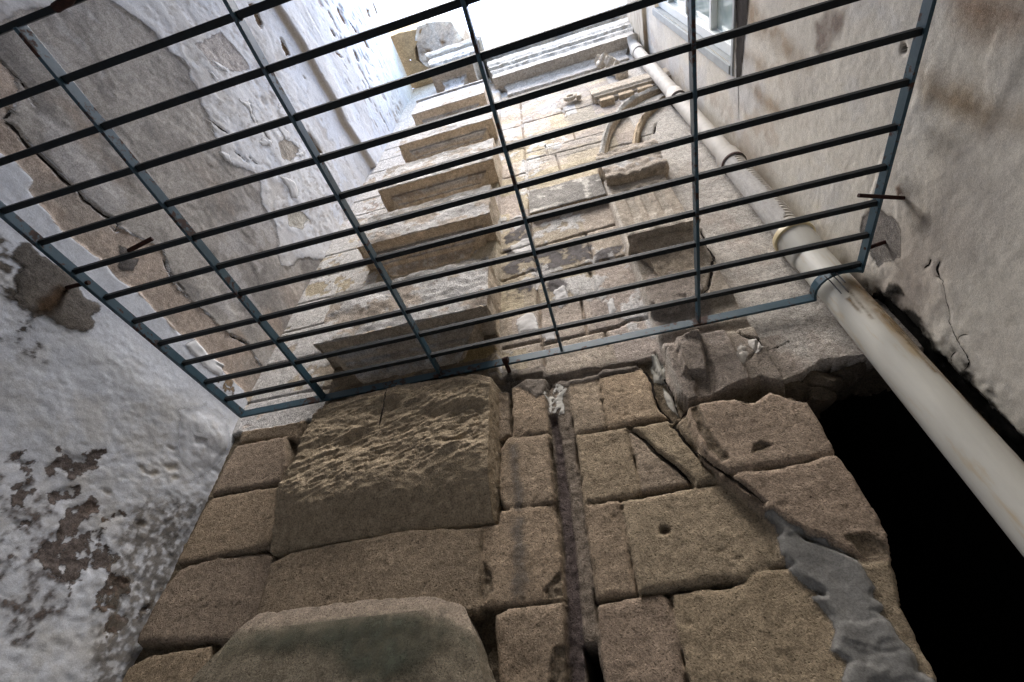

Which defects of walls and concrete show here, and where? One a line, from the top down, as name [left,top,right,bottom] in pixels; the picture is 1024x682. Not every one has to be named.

flaking render [195,33,249,82]
flaking render [259,126,304,161]
flaking render [0,62,261,401]
flaking render [288,211,310,229]
crack [924,259,970,369]
crack [602,354,763,503]
peeling [0,446,163,645]